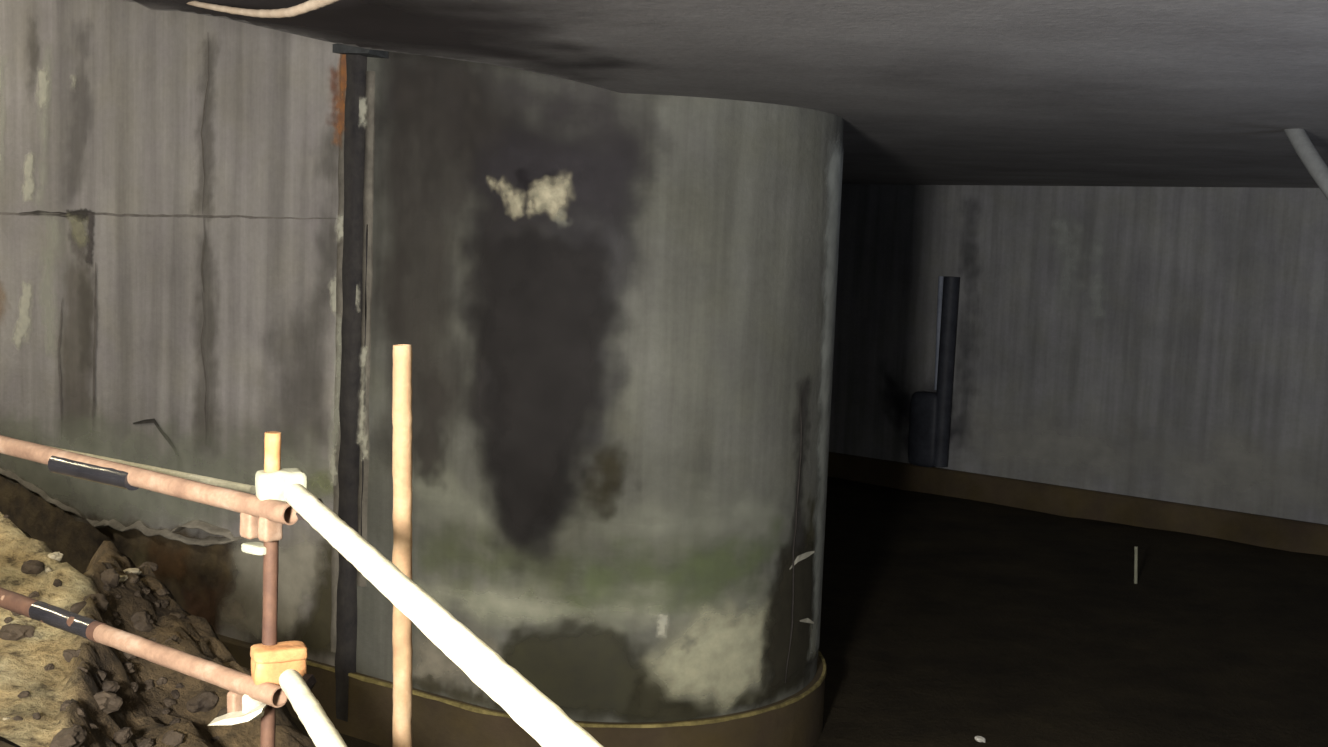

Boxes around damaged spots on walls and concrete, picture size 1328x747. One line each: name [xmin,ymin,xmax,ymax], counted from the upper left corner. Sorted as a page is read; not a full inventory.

damp [37,71,49,107]
damp [23,154,34,200]
spalling [487,171,570,217]
crack [0,41,338,454]
damp [133,0,641,551]
damp [13,283,31,347]
damp [0,453,216,518]
damp [0,426,264,484]
damp [456,145,844,722]
spalling [0,466,245,629]
damp [412,637,502,710]